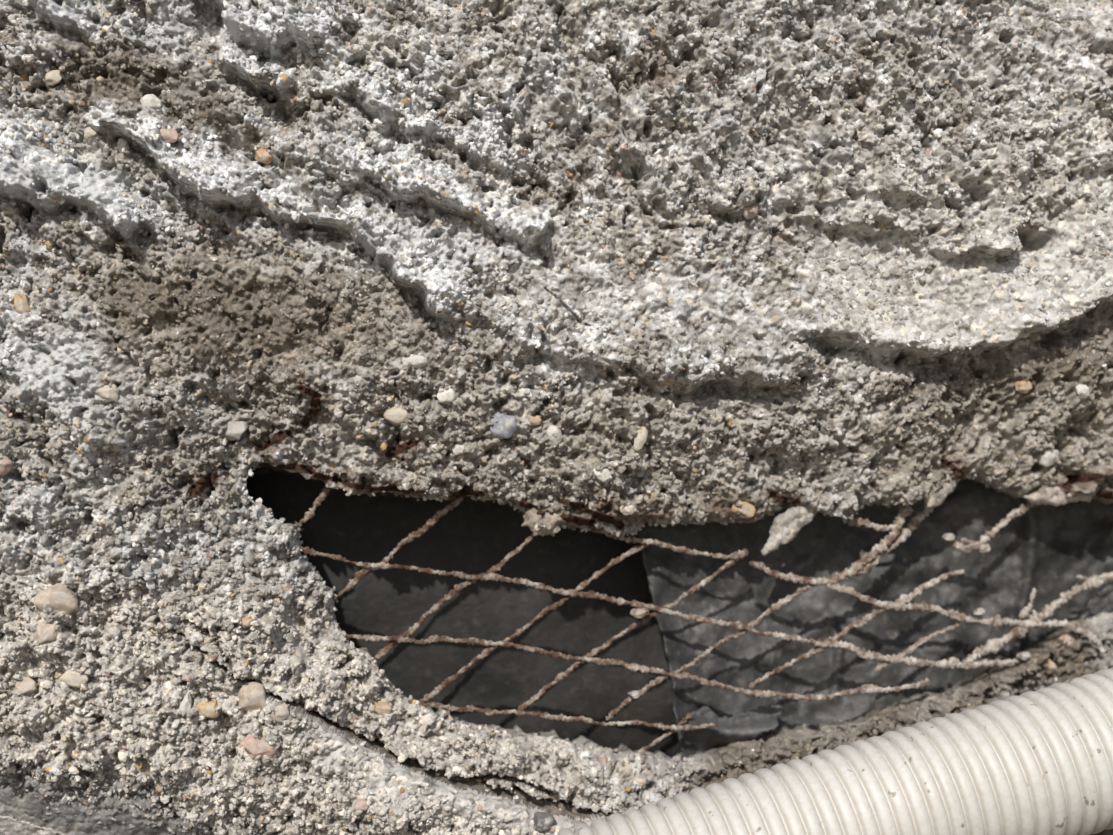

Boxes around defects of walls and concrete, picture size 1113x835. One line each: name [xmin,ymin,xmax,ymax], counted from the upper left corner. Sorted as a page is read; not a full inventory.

rust [255,384,422,494]
rust [448,486,484,499]
rust [519,498,624,529]
rust [770,492,801,504]
spalling [612,300,1113,556]
rust [1062,473,1113,499]
spalling [242,464,1094,765]
crack [161,620,614,821]